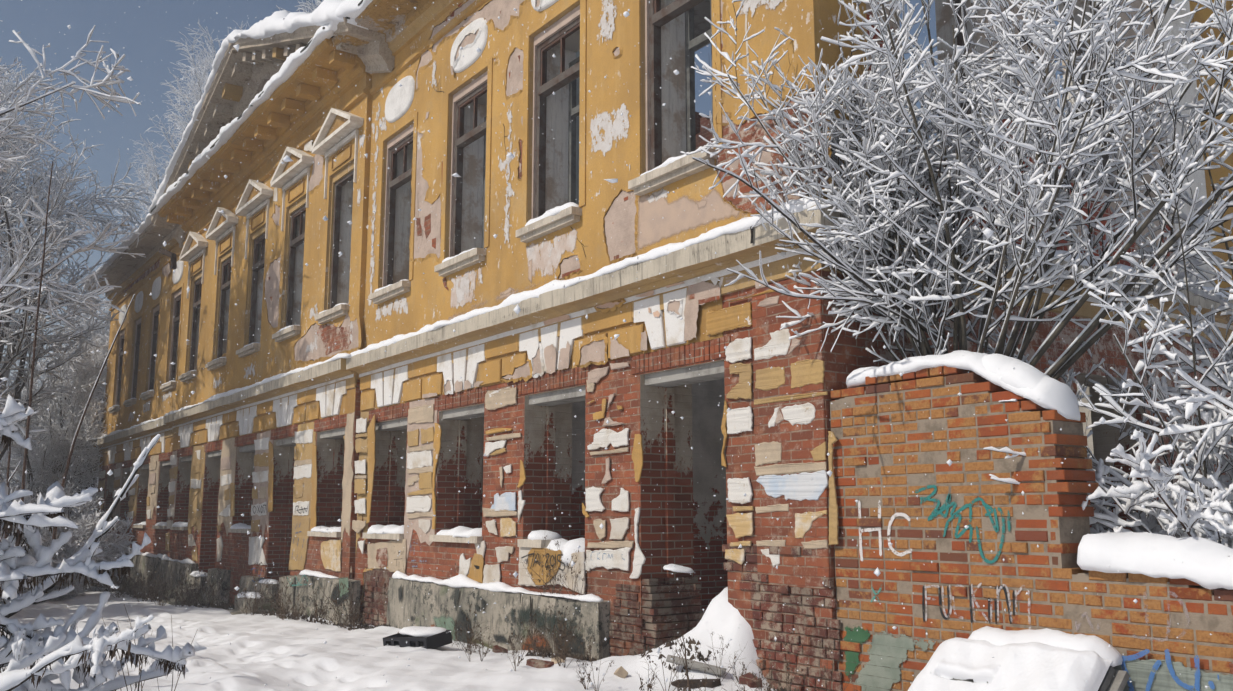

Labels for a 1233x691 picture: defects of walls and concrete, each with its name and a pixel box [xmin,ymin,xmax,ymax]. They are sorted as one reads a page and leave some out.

spalling [409,112,442,263]
spalling [415,0,542,92]
spalling [493,46,524,253]
peeling [589,90,629,156]
spalling [599,187,639,264]
flaking render [713,0,832,215]
leakage [330,577,350,606]
flaking render [289,414,407,626]
leakage [454,588,584,655]
flaking render [406,331,647,595]
flaking render [594,275,839,567]
peeling [843,625,941,691]